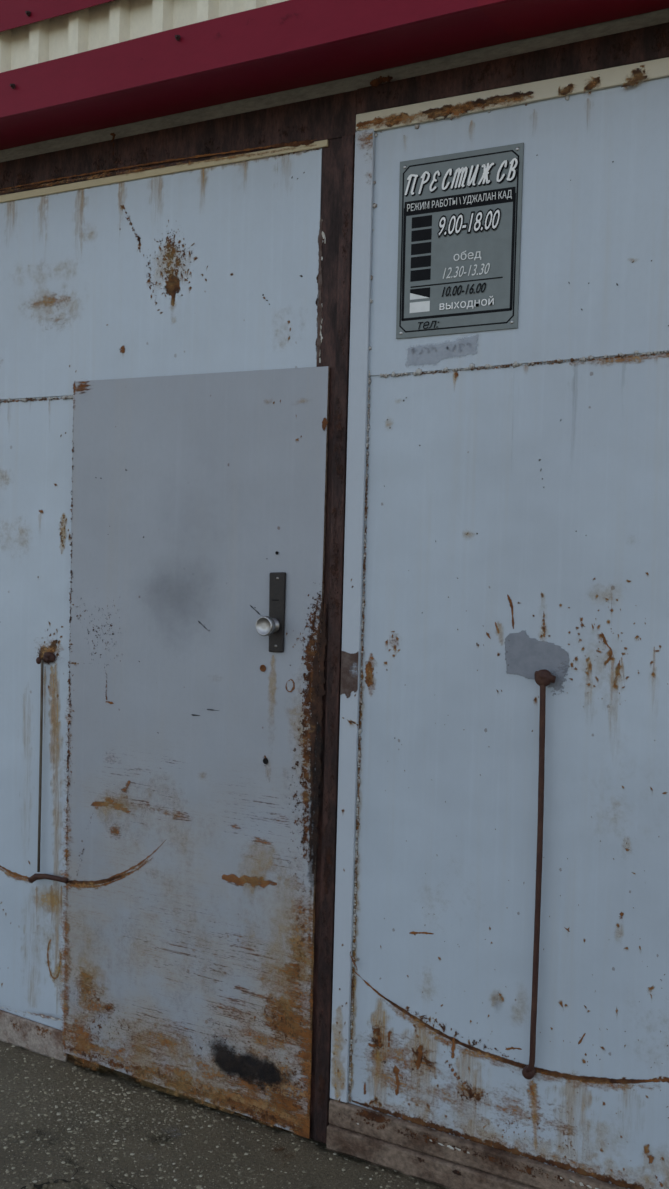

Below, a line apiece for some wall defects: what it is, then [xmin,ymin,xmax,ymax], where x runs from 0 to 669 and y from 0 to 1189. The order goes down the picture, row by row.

rust [146,220,208,314]
rust [574,353,669,364]
rust [568,595,661,701]
rust [37,537,315,1139]
rust [333,432,644,1189]